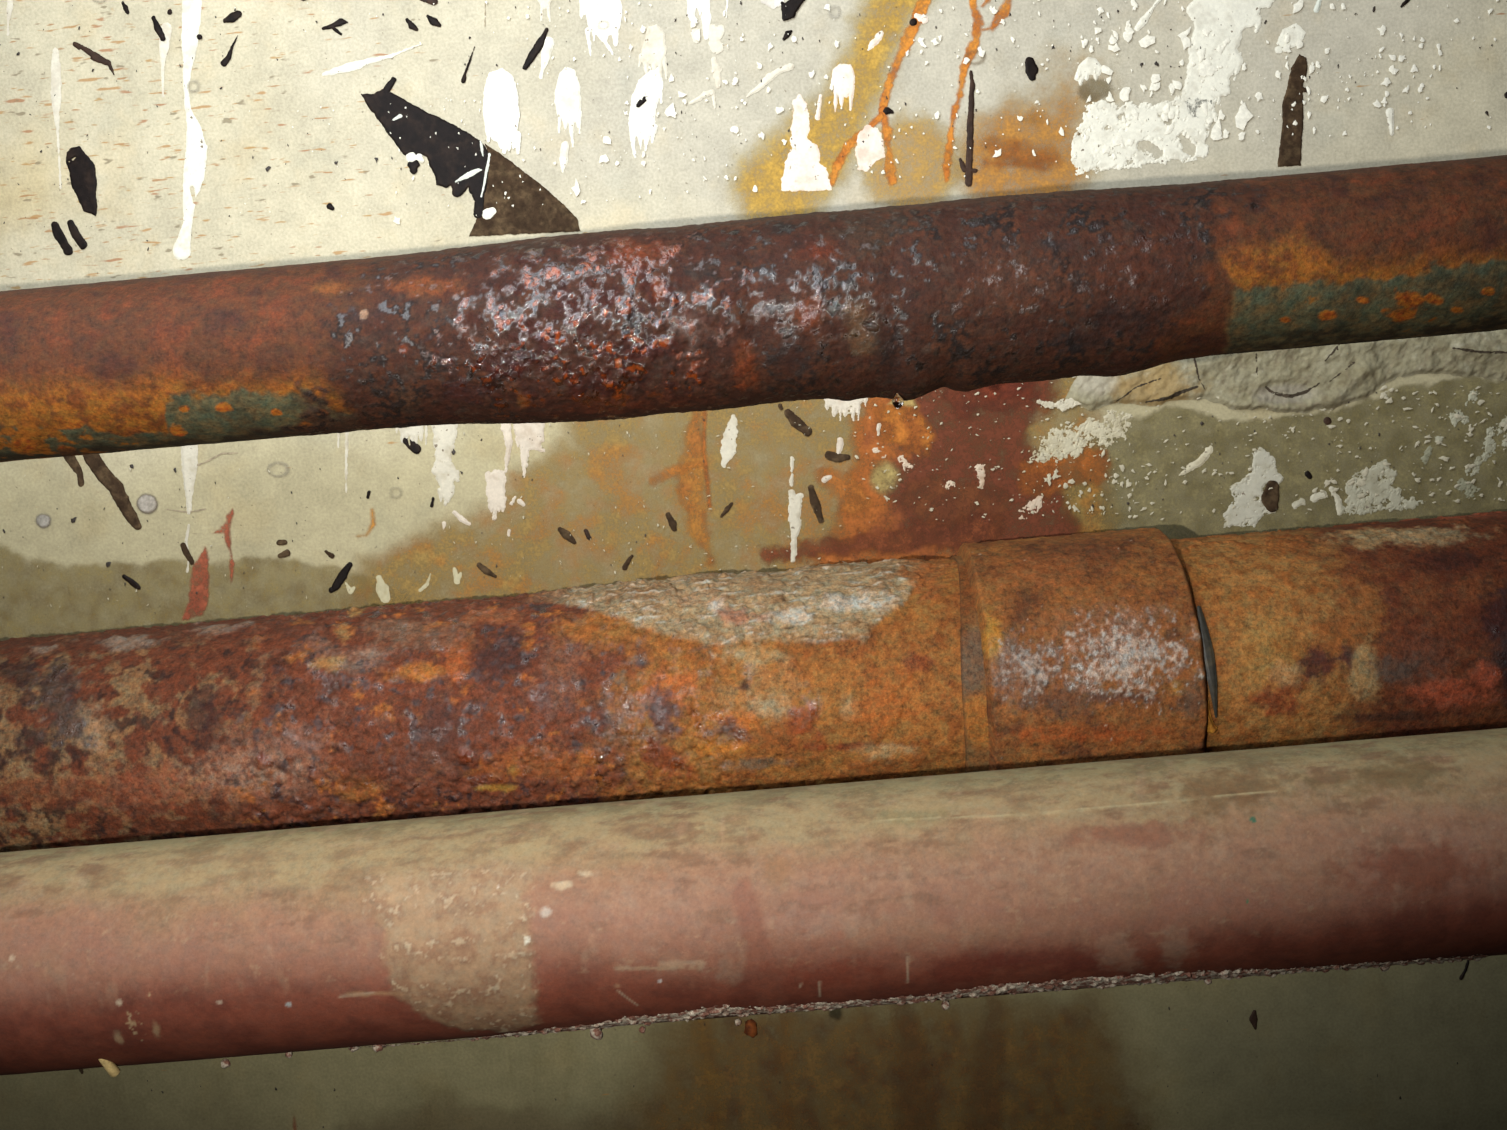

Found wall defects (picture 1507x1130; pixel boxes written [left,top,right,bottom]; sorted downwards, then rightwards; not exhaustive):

rust [736,0,1087,219]
spalling [1065,329,1507,414]
rust [359,376,1111,607]